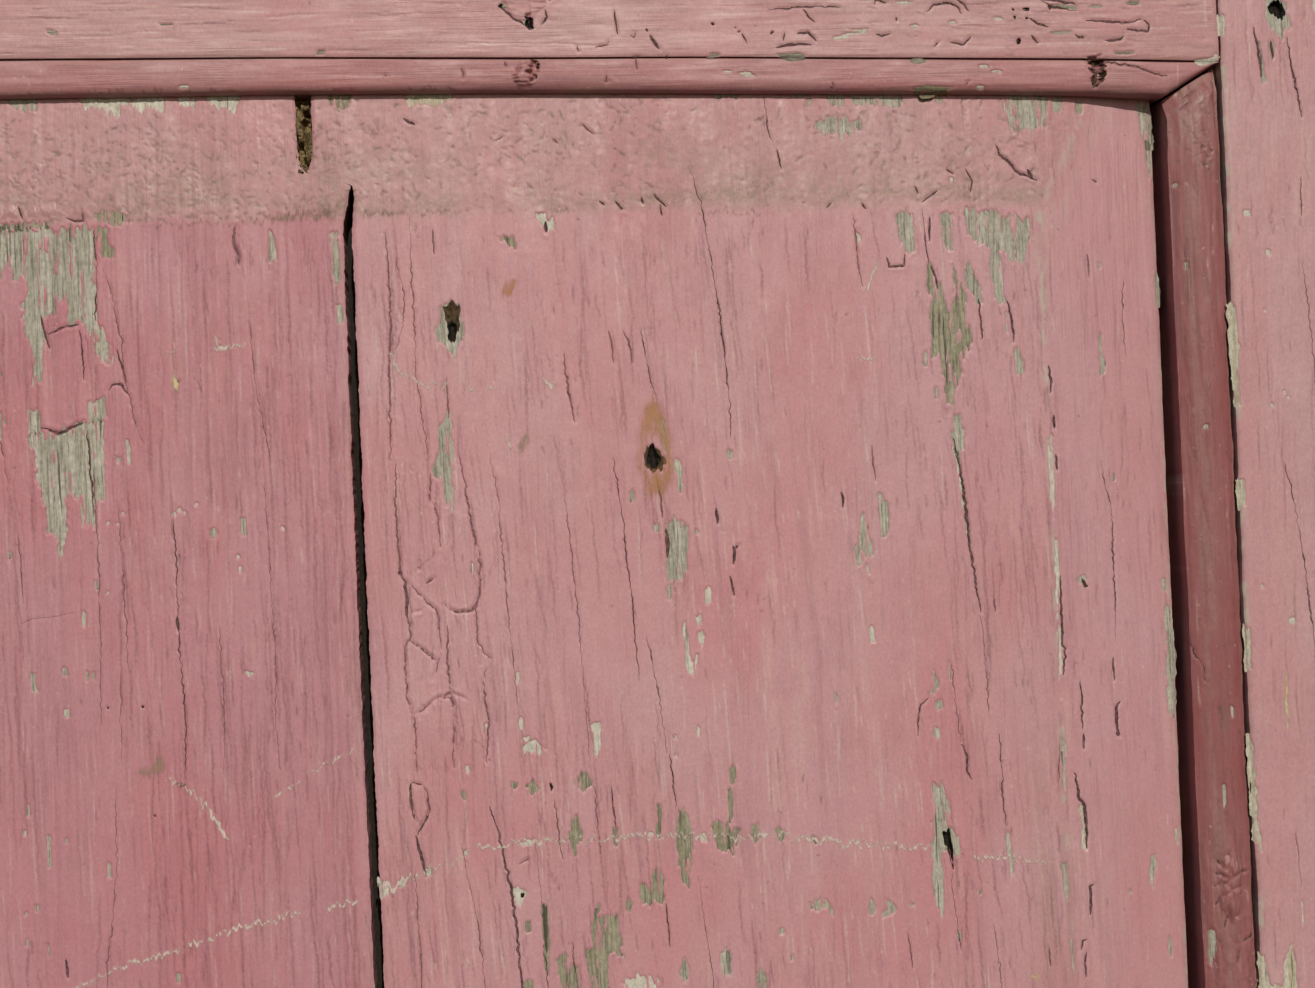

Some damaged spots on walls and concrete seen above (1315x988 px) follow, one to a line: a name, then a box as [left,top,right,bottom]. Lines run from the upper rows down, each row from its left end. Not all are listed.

peeling [0,210,132,386]
crack [563,353,575,421]
peeling [923,207,1030,535]
peeling [27,396,131,559]
crack [385,217,520,988]
crack [560,469,616,853]
crack [917,438,1007,825]
crack [489,801,578,988]
peeling [523,866,665,988]
peeling [648,765,760,889]
spalling [931,782,961,917]
peeling [1257,945,1298,988]